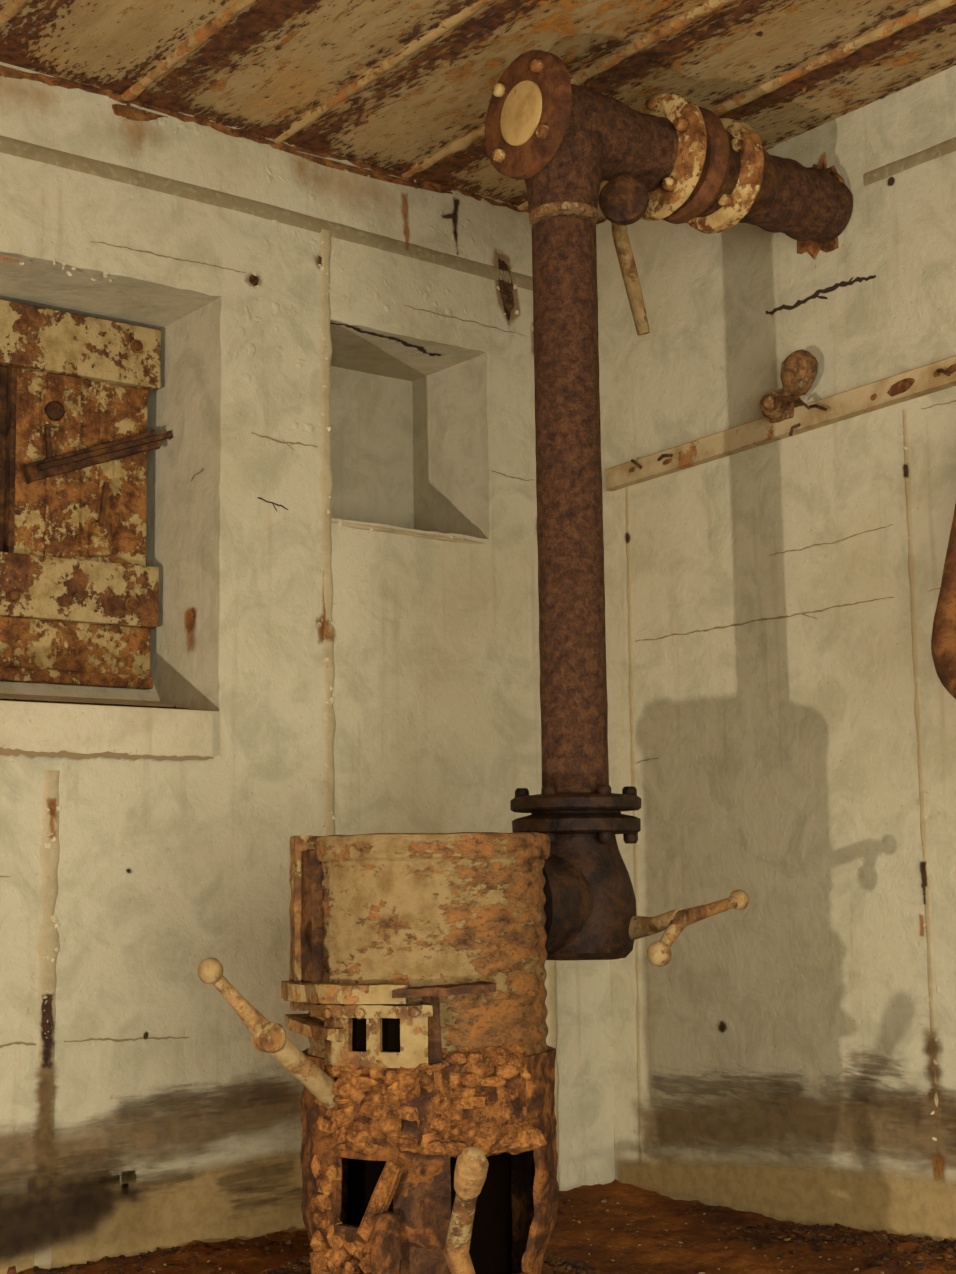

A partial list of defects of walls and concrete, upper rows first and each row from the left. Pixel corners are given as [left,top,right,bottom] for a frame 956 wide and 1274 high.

rust [0,0,956,255]
crack [766,275,876,315]
rust [871,378,915,401]
rust [185,609,194,650]
rust [36,994,54,1193]
damp [0,1084,307,1274]
damp [619,1091,956,1242]